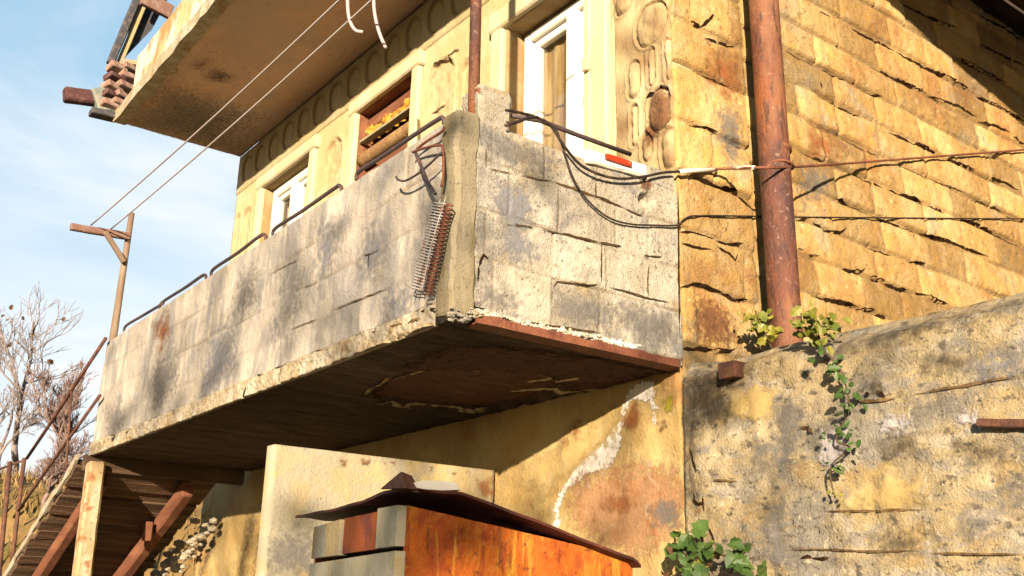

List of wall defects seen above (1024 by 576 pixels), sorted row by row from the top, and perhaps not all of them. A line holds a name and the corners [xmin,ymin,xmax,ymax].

spalling [395,126,445,195]
rust [155,315,168,349]
leakage [152,355,176,408]
leakage [202,329,238,387]
leakage [237,273,253,310]
spalling [447,306,483,323]
rust [392,340,670,393]
peeling [546,328,642,349]
leakage [553,381,658,528]